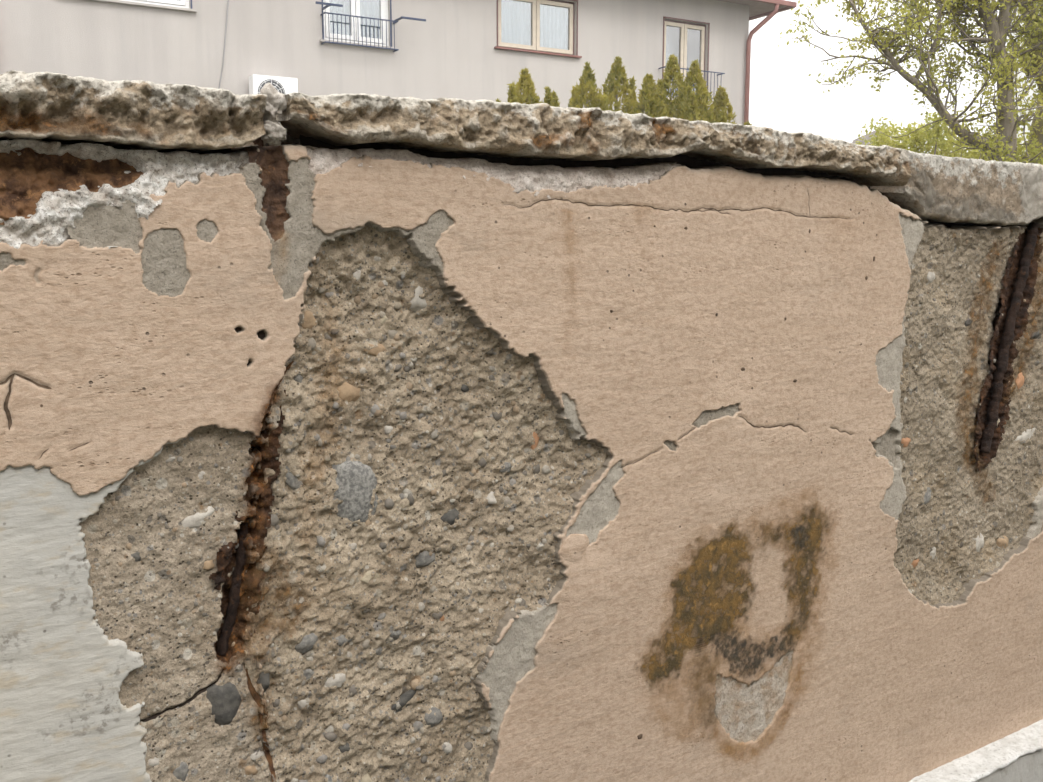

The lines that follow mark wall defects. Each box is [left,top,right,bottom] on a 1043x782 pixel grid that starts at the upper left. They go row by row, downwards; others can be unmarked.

crack [42,135,871,242]
crack [928,220,992,228]
crack [0,374,51,430]
spalling [0,138,682,782]
crack [739,416,806,432]
spalling [871,213,1043,605]
corrosion [957,222,1043,504]
crack [137,361,294,782]
corrosion [216,523,307,661]